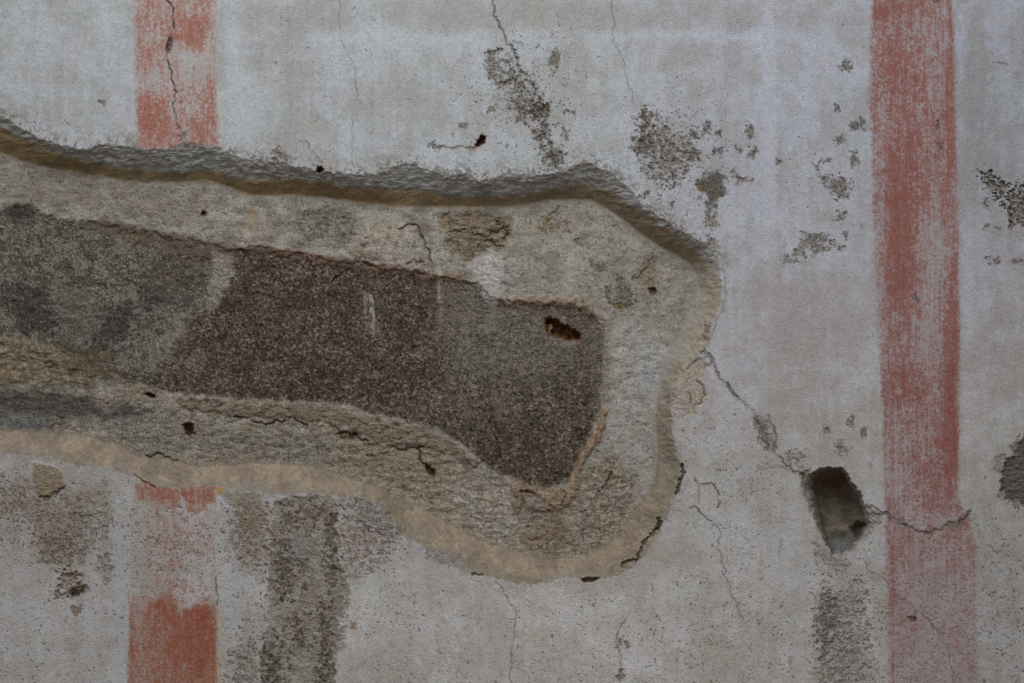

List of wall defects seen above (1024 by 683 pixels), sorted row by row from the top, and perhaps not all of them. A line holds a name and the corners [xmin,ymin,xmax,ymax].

crack [165,0,189,142]
spalling [780,102,871,267]
spalling [975,163,1024,234]
spalling [984,255,1024,266]
spalling [0,46,760,683]
crack [699,258,806,481]
peeling [751,412,883,683]
spalling [991,434,1024,510]